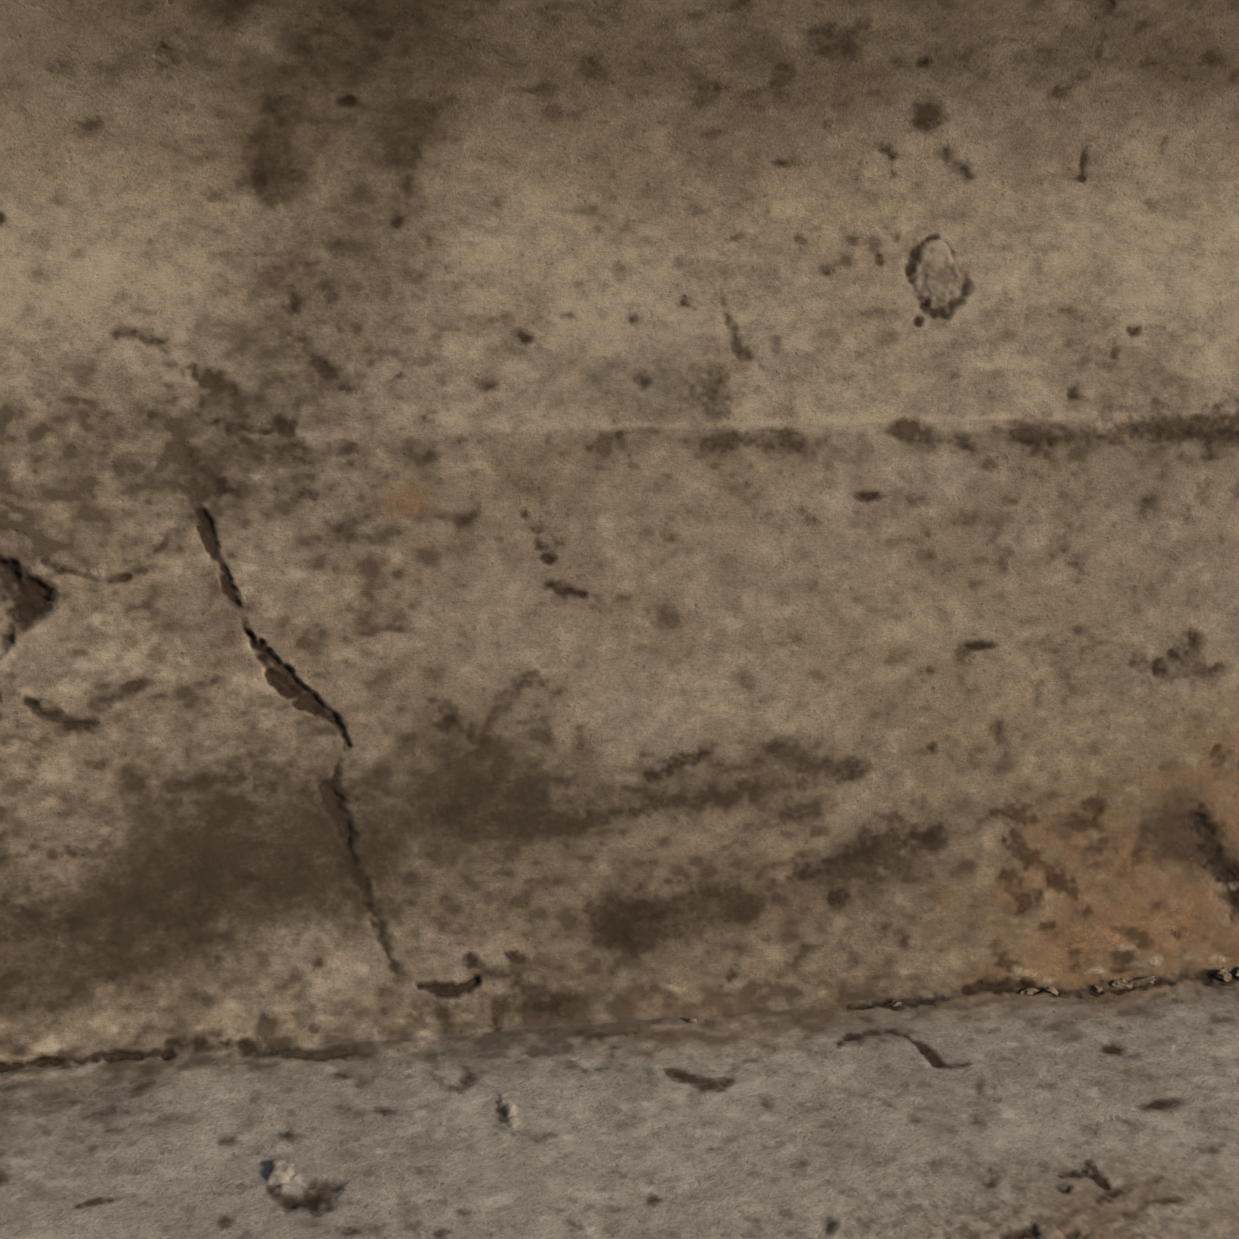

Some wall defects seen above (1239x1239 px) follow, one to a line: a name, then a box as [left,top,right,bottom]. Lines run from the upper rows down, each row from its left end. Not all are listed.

spalling [906,236,969,327]
crack [41,539,167,583]
crack [196,508,397,973]
leakage [644,750,706,780]
rust [1067,788,1110,832]
leakage [584,894,689,949]
leakage [789,815,941,906]
rust [972,804,1239,1000]
spalling [1143,800,1239,914]
crack [837,971,1239,1068]